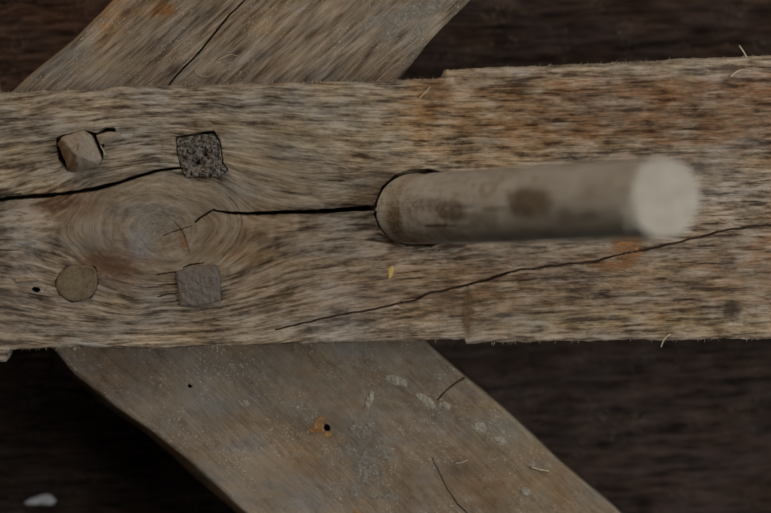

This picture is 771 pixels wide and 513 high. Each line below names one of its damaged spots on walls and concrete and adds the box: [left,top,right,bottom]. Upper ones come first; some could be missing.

crack [169,0,245,85]
crack [0,167,182,201]
crack [275,225,771,330]